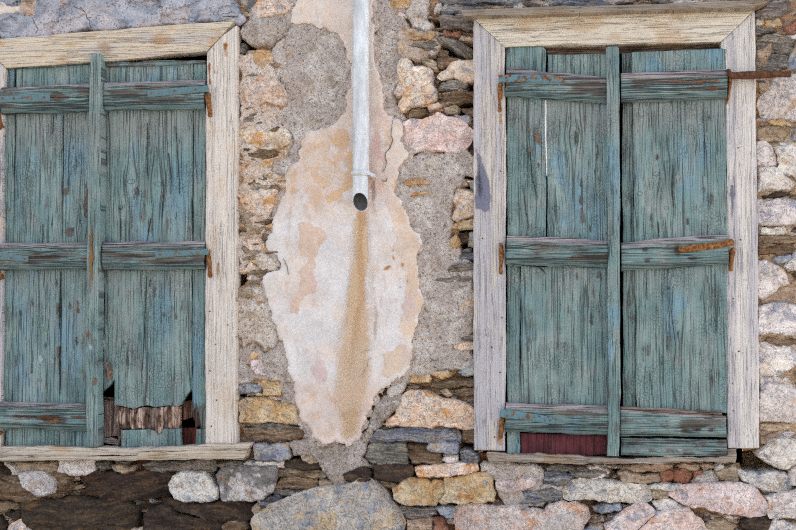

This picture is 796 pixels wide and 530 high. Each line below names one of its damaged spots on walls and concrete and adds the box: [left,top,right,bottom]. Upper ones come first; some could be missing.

rust [695,69,791,90]
water stain [339,212,369,396]
flaking render [238,0,474,485]